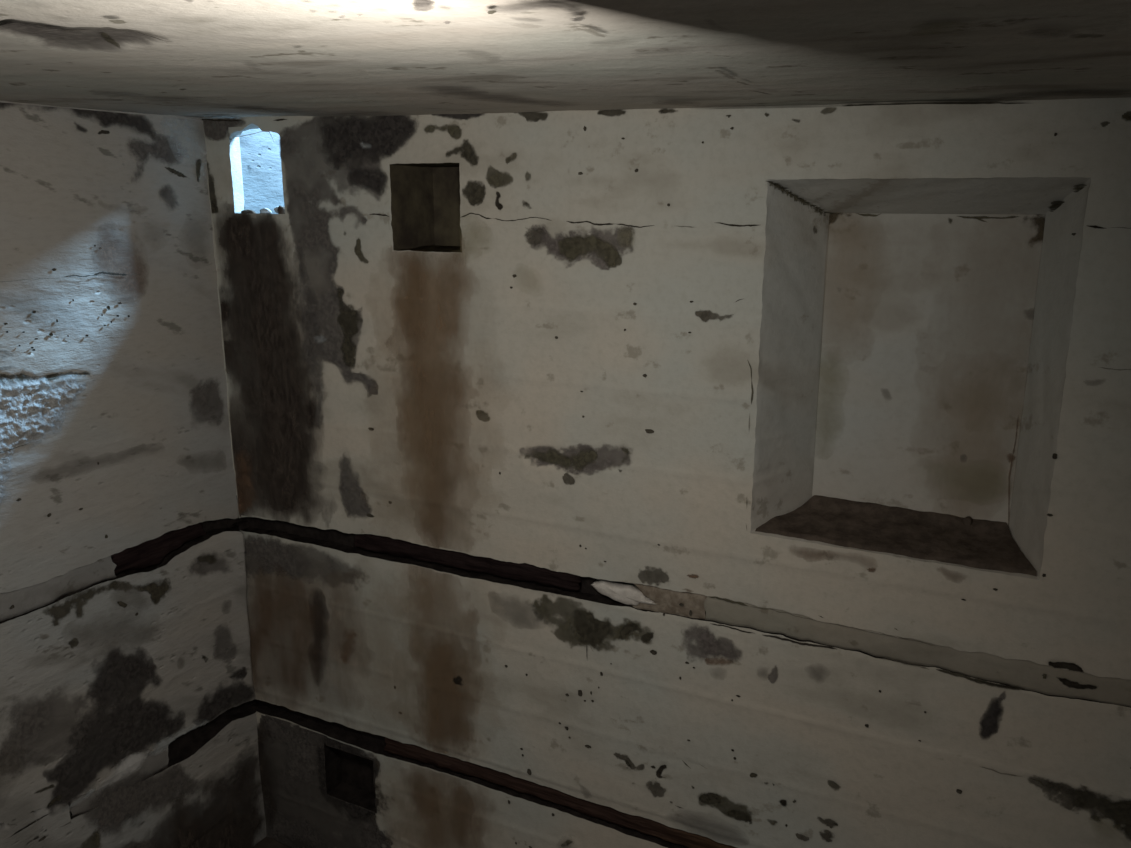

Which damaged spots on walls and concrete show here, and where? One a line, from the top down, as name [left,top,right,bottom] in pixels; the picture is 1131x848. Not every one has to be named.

leakage [515,112,548,122]
crack [462,213,687,228]
crack [718,220,758,228]
leakage [72,109,530,522]
leakage [46,579,170,626]
leakage [533,594,653,653]
leakage [0,649,392,848]
leakage [1029,777,1131,841]